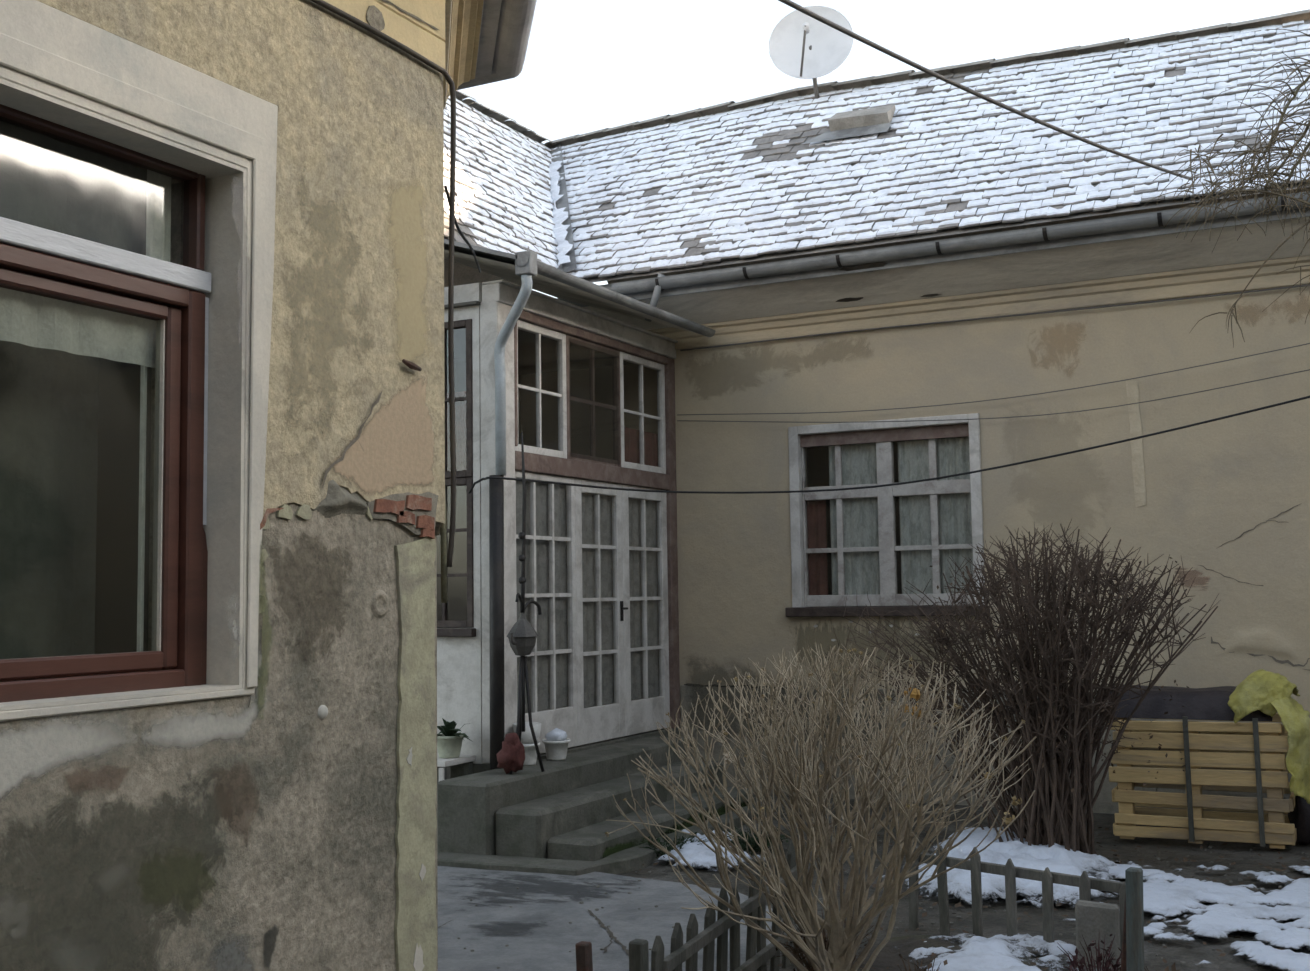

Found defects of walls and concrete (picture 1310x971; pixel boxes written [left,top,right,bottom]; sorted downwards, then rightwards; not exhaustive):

crack [322,391,382,488]
crack [1199,503,1302,586]
crack [1211,637,1310,671]
water stain [0,773,232,971]
water stain [209,927,278,971]